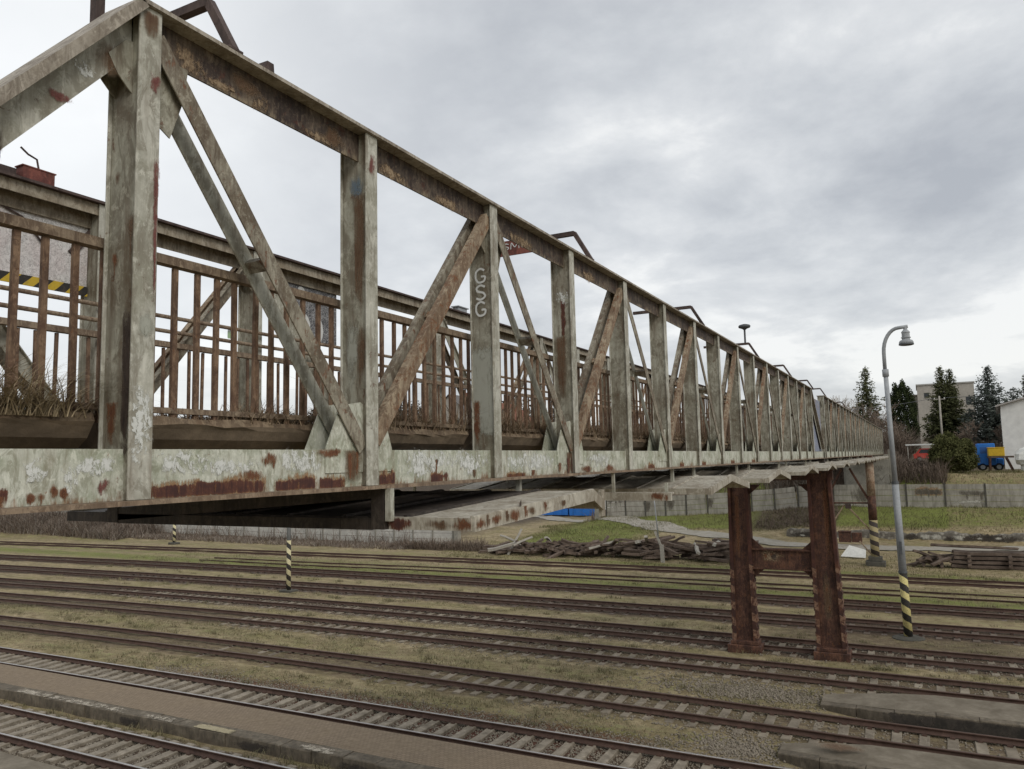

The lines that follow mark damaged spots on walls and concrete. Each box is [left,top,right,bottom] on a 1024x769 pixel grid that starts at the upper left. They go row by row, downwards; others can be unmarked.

corrosion [176,44,268,112]
corrosion [305,127,342,147]
corrosion [107,402,117,445]
peeling [131,385,261,475]
peeling [61,458,115,496]
corrosion [151,448,361,499]
corrosion [431,459,449,482]
corrosion [0,488,11,507]
corrosion [27,485,68,505]
corrosion [388,518,411,531]
corrosion [430,501,547,531]